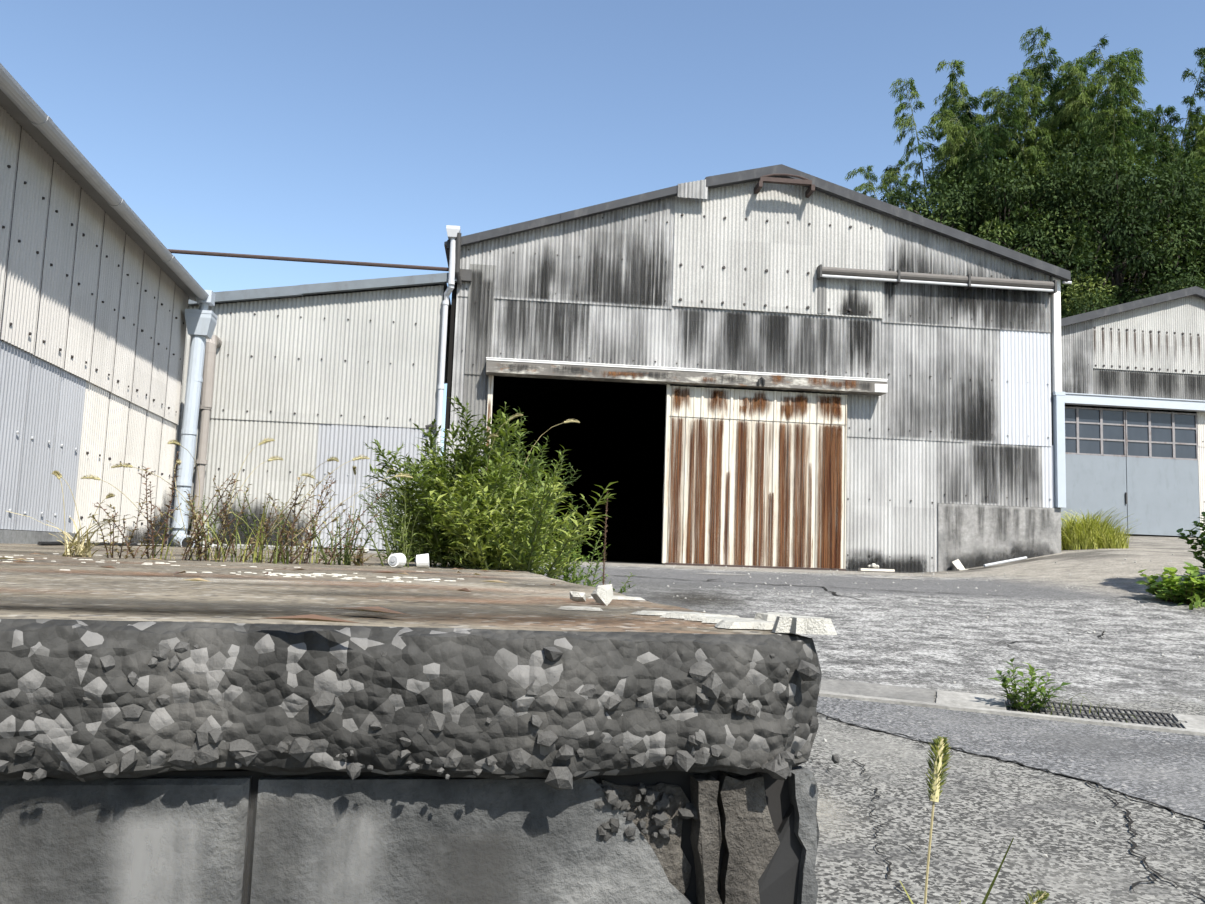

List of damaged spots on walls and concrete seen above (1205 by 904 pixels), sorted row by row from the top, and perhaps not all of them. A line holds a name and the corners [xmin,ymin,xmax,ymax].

damp [505,255,663,373]
damp [727,295,872,373]
damp [943,272,1039,328]
damp [1099,371,1202,395]
corrosion [669,377,857,569]
damp [954,383,1036,503]
spalling [613,596,837,635]
spalling [168,719,258,768]
spalling [398,710,463,779]
spalling [473,715,585,790]
spalling [595,732,820,904]
crack [811,712,1205,904]